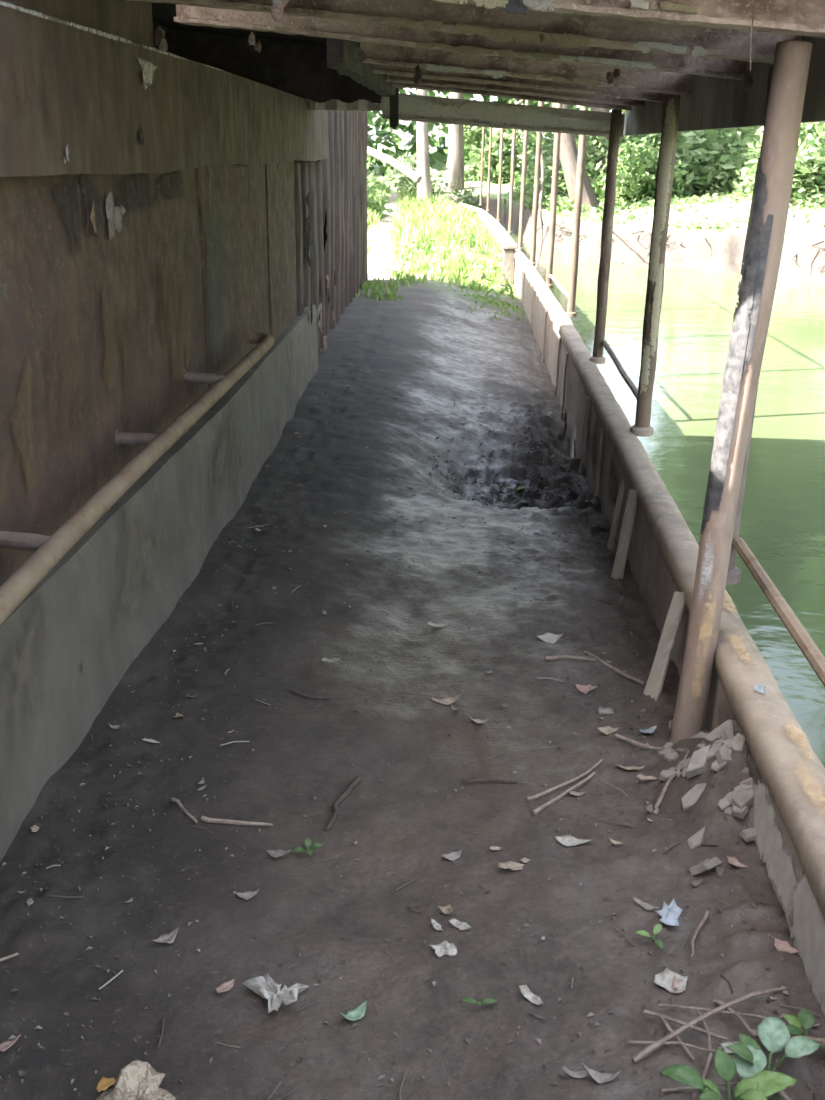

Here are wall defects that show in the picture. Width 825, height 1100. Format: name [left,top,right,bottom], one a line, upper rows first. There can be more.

peeling [630,0,698,14]
corrosion [248,32,261,53]
peeling [90,191,126,241]
corrosion [699,543,734,642]